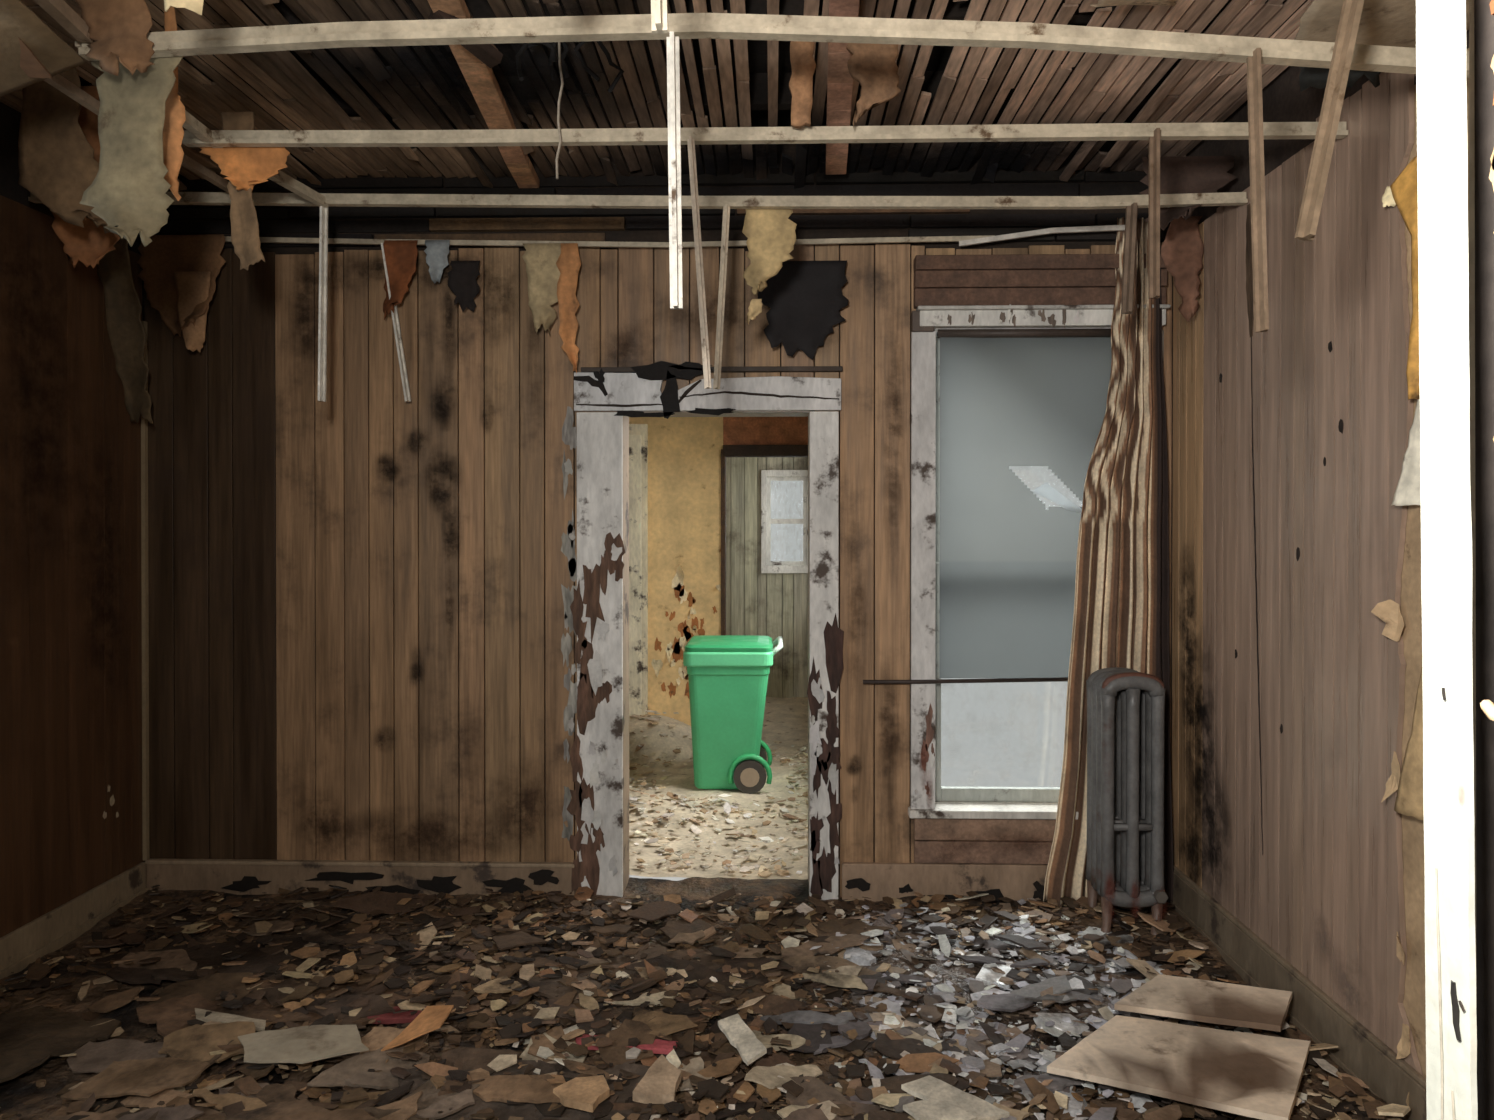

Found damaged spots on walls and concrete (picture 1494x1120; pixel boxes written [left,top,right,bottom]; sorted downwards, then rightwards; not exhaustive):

peeling [482,406,625,895]
peeling [807,613,844,897]
water stain [1182,572,1193,666]
water stain [1182,685,1227,883]
flaking render [1381,84,1426,1078]